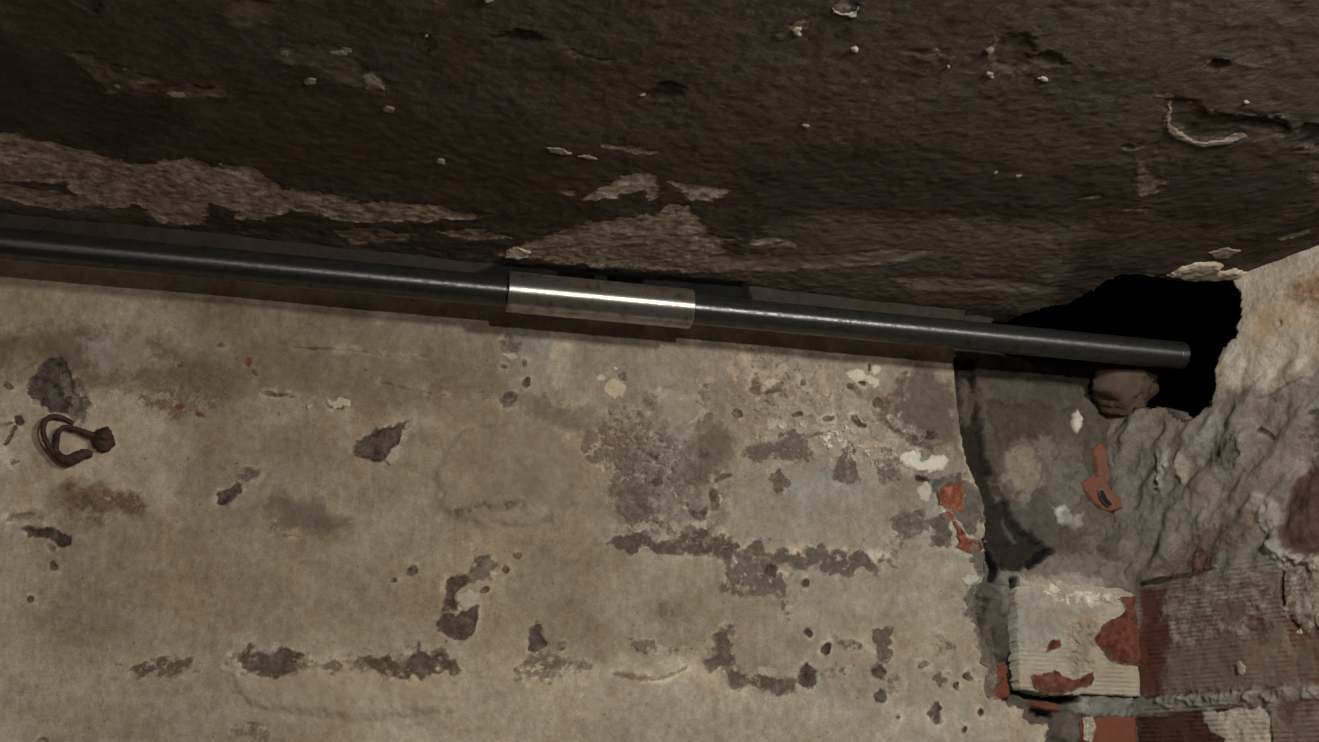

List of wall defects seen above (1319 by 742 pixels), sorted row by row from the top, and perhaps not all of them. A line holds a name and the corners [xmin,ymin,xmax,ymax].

peeling [0,0,1319,418]
peeling [0,245,1319,742]